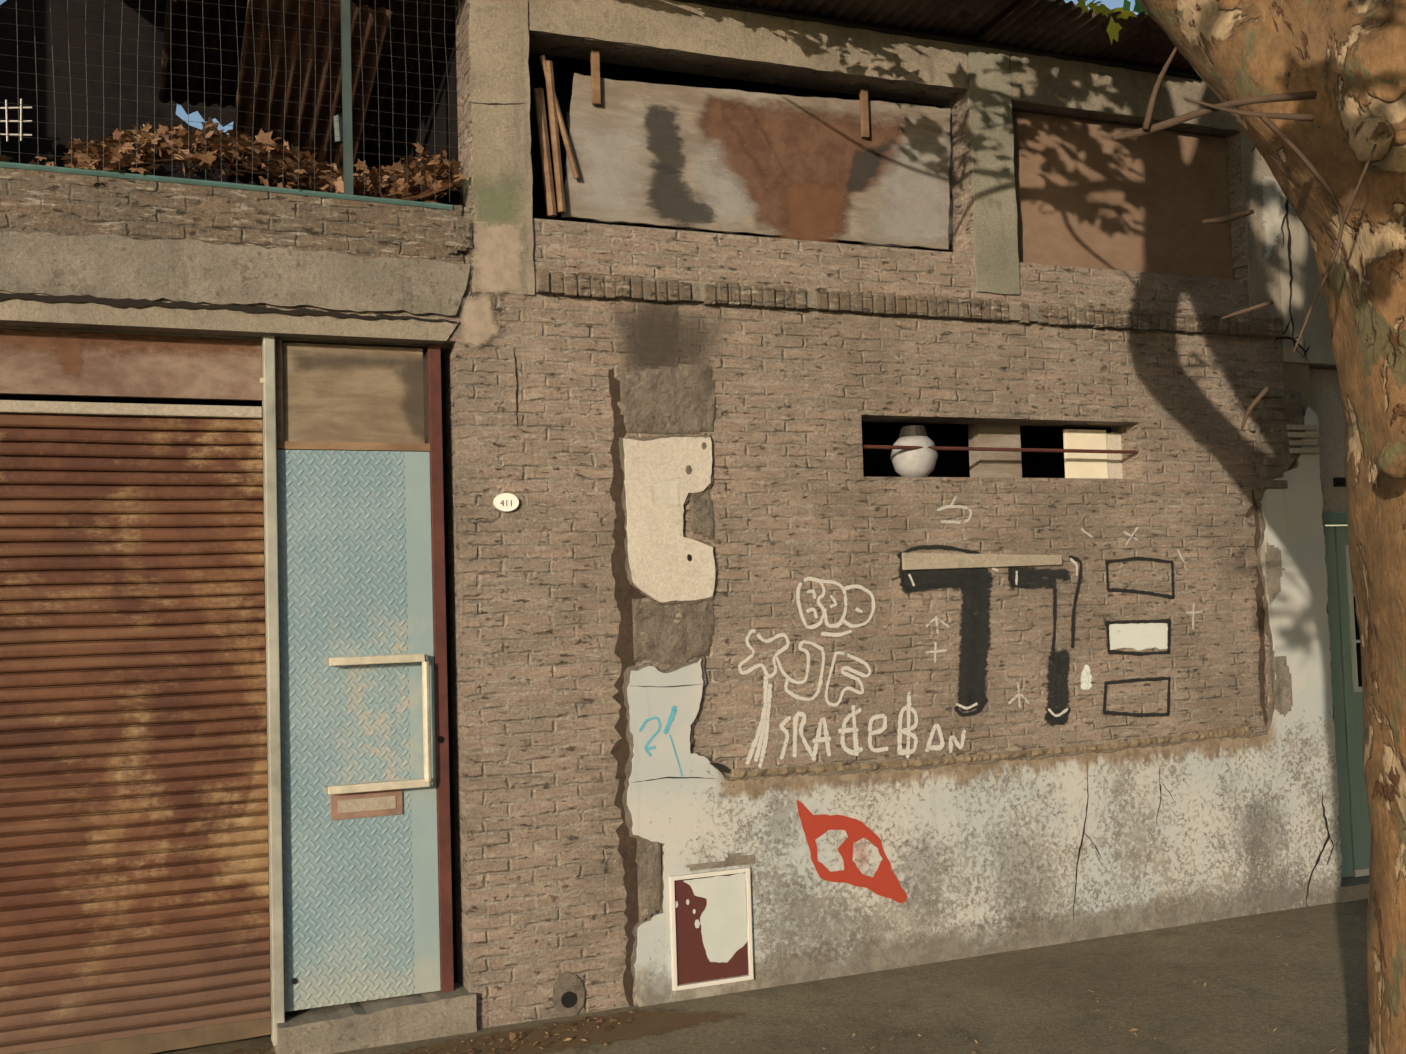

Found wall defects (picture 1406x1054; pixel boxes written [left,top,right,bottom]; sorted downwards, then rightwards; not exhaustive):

flaking render [619,364,720,666]
peeling [637,839,755,963]
crack [1073,767,1102,920]
crack [1306,792,1334,907]